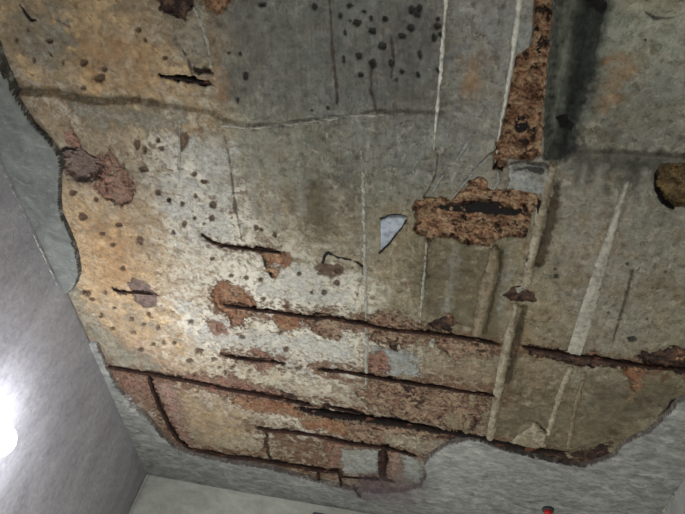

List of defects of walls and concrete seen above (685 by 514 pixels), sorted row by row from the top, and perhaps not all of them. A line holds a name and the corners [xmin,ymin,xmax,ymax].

crack [329,1,338,97]
crack [369,60,377,108]
spalling [380,0,553,249]
spalling [654,163,685,210]
spalling [313,263,346,285]
crack [321,251,363,274]
spalling [204,274,266,339]
rust [207,294,504,357]
rust [217,347,295,373]
rust [510,339,685,382]
rust [107,358,569,488]
flaking render [89,304,685,514]